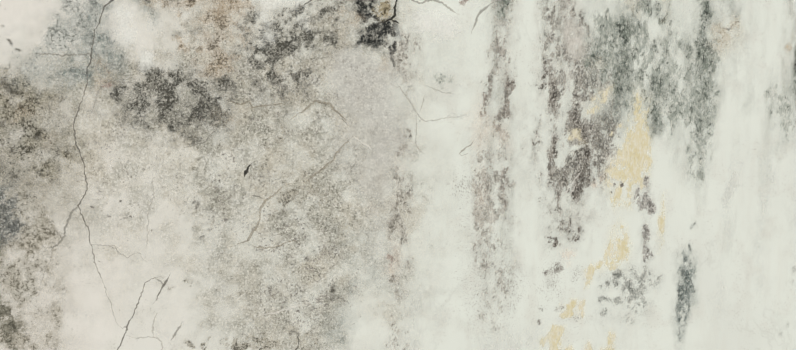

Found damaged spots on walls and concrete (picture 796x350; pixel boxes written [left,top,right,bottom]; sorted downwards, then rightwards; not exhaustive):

crack [73,0,170,350]
water stain [0,0,350,350]
water stain [353,0,420,83]
water stain [380,168,413,298]
water stain [447,0,720,342]
water stain [766,46,796,131]